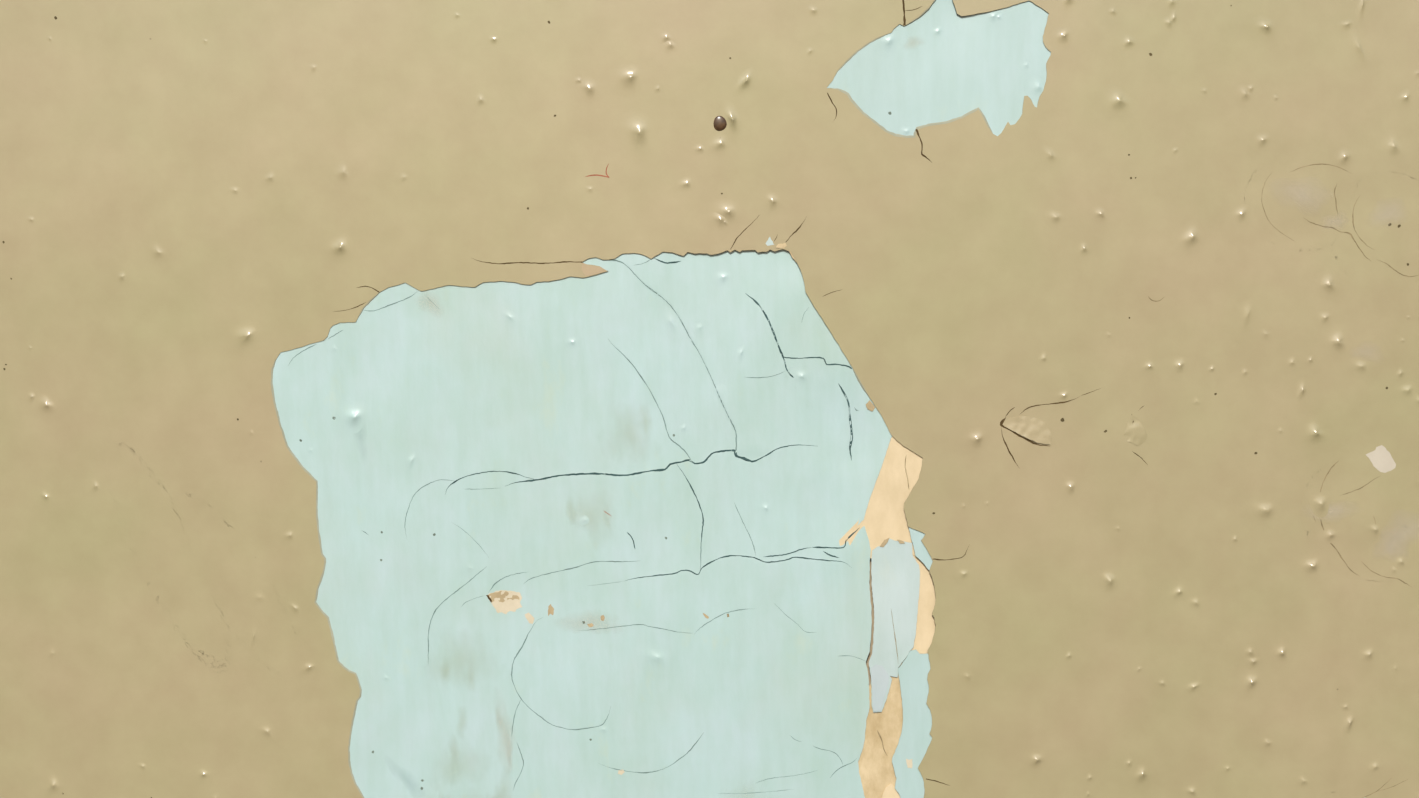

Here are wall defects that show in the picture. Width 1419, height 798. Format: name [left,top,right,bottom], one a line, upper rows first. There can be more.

peeling [827,0,1051,138]
peeling [271,237,936,798]
crack [405,259,859,660]
peeling [1003,416,1052,445]
crack [511,618,611,786]
crack [601,735,702,773]
crack [719,731,887,794]